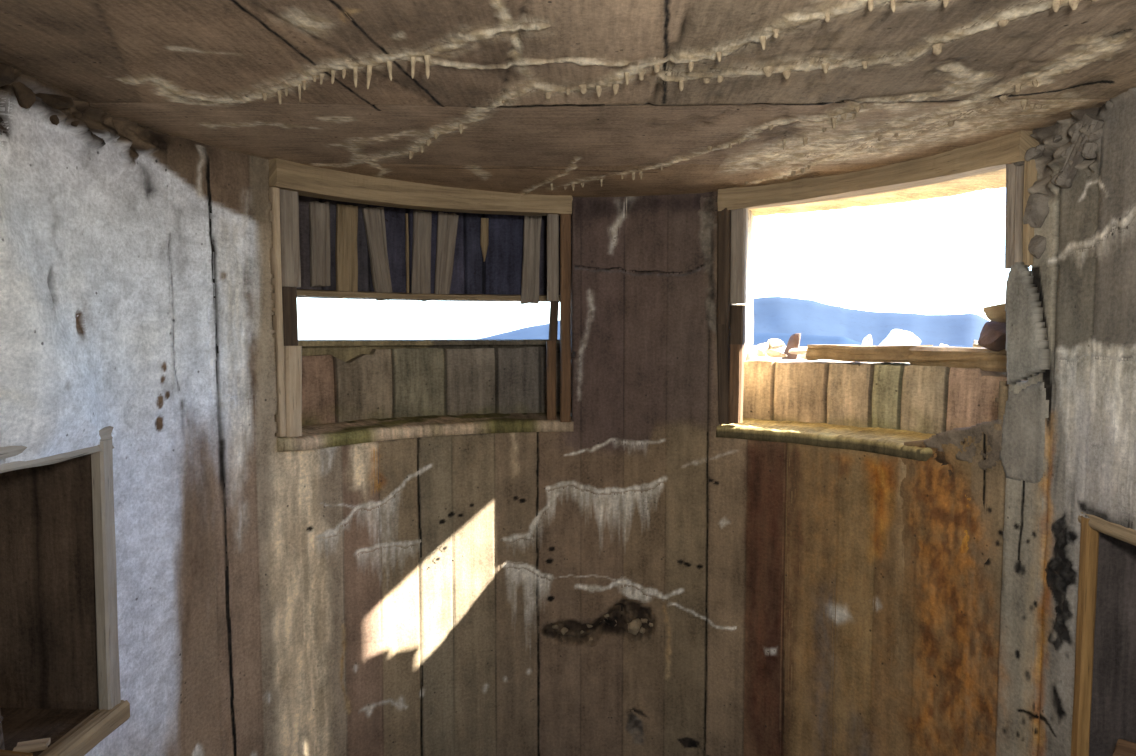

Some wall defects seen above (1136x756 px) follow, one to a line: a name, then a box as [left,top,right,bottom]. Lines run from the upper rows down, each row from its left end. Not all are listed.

spalling [0,63,170,179]
leakage [574,286,598,404]
leakage [605,197,627,257]
leakage [101,0,1136,195]
spalling [999,87,1136,483]
leakage [1046,200,1136,284]
leakage [1076,176,1111,205]
leakage [133,144,434,756]
spalling [537,595,658,650]
leakage [499,447,740,683]
rust [737,441,1018,756]
leakage [999,335,1136,756]